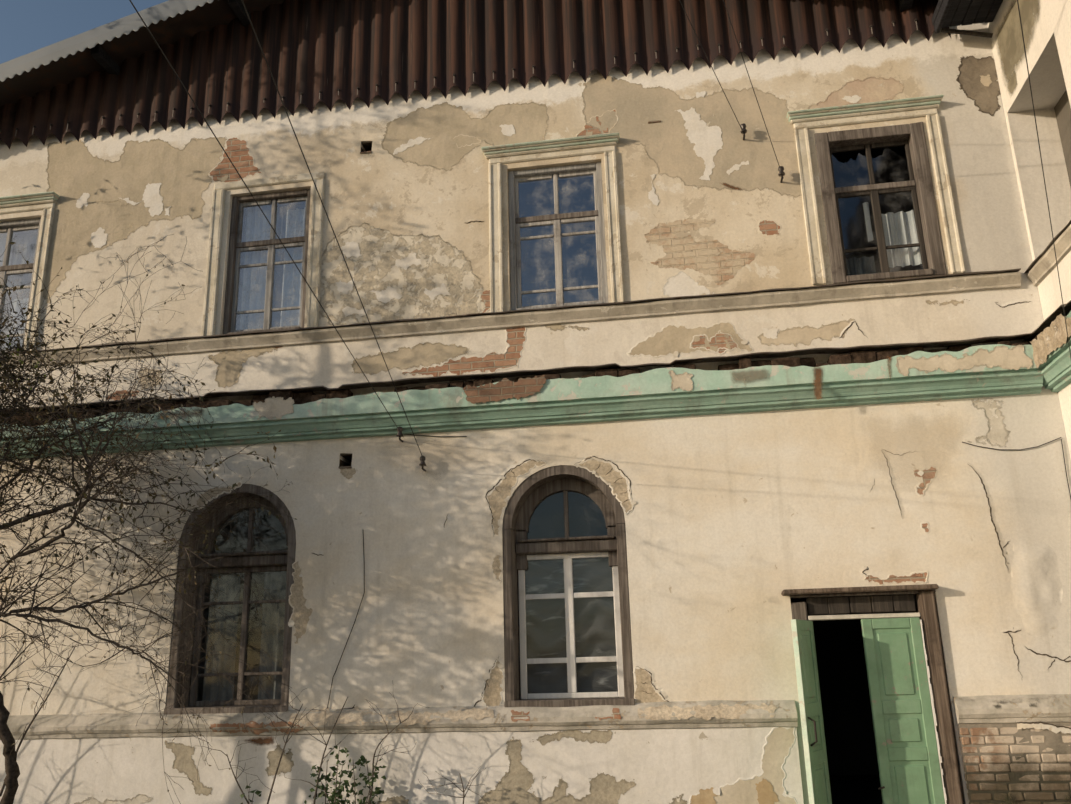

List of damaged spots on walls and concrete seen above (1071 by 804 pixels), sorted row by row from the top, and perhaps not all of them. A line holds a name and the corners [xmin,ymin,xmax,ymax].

spalling [956,56,1001,116]
flaking render [381,102,549,171]
flaking render [43,136,262,305]
flaking render [319,222,490,326]
flaking render [644,217,755,285]
flaking render [351,327,546,404]
crack [870,449,915,519]
crack [968,462,1011,574]
crack [1002,627,1071,674]
peeling [165,740,212,796]
peeling [478,708,636,804]
spalling [633,667,797,804]